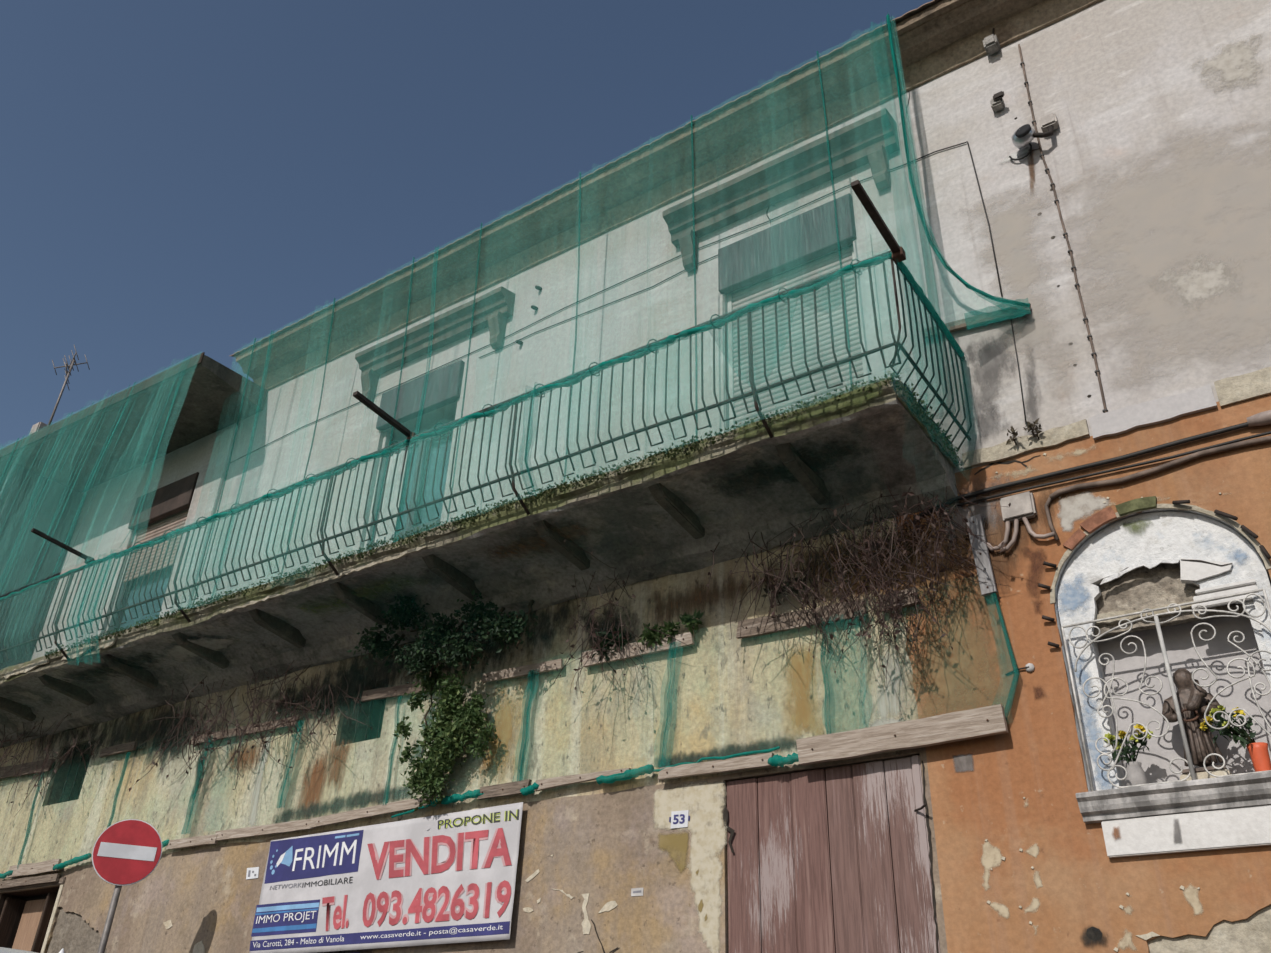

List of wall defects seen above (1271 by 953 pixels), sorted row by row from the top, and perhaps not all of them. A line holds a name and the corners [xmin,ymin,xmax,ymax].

damp [967,343,1014,438]
damp [1027,344,1039,435]
spalling [1057,544,1253,635]
peeling [1072,657,1113,789]
rust [299,742,348,809]
peeling [981,839,1043,934]
spalling [1082,905,1271,953]
peeling [1180,885,1203,914]